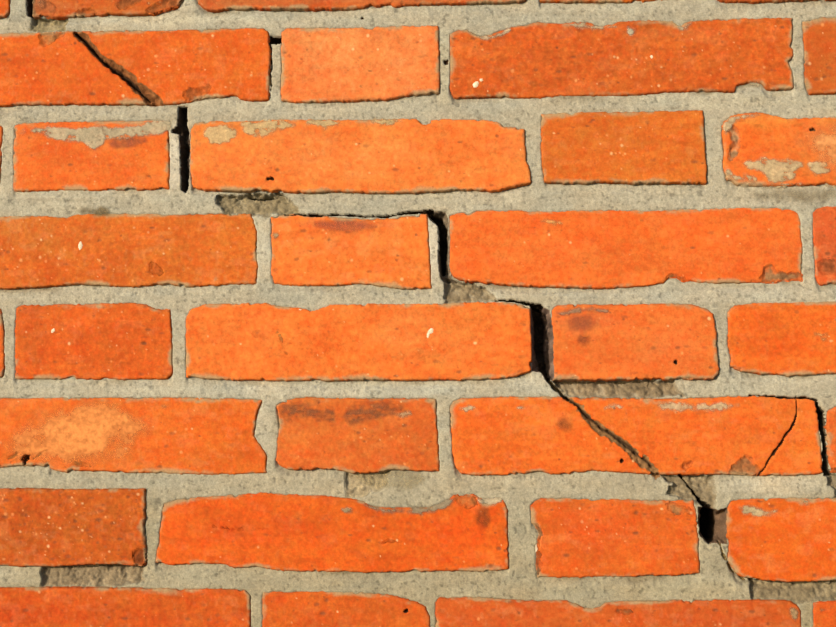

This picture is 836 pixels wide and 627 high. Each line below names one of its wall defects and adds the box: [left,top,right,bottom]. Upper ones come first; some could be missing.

crack [26,0,34,19]
crack [267,42,275,98]
crack [74,32,190,193]
spalling [726,126,741,161]
peeling [215,192,300,218]
crack [290,209,458,284]
crack [497,300,745,580]
crack [748,395,831,476]